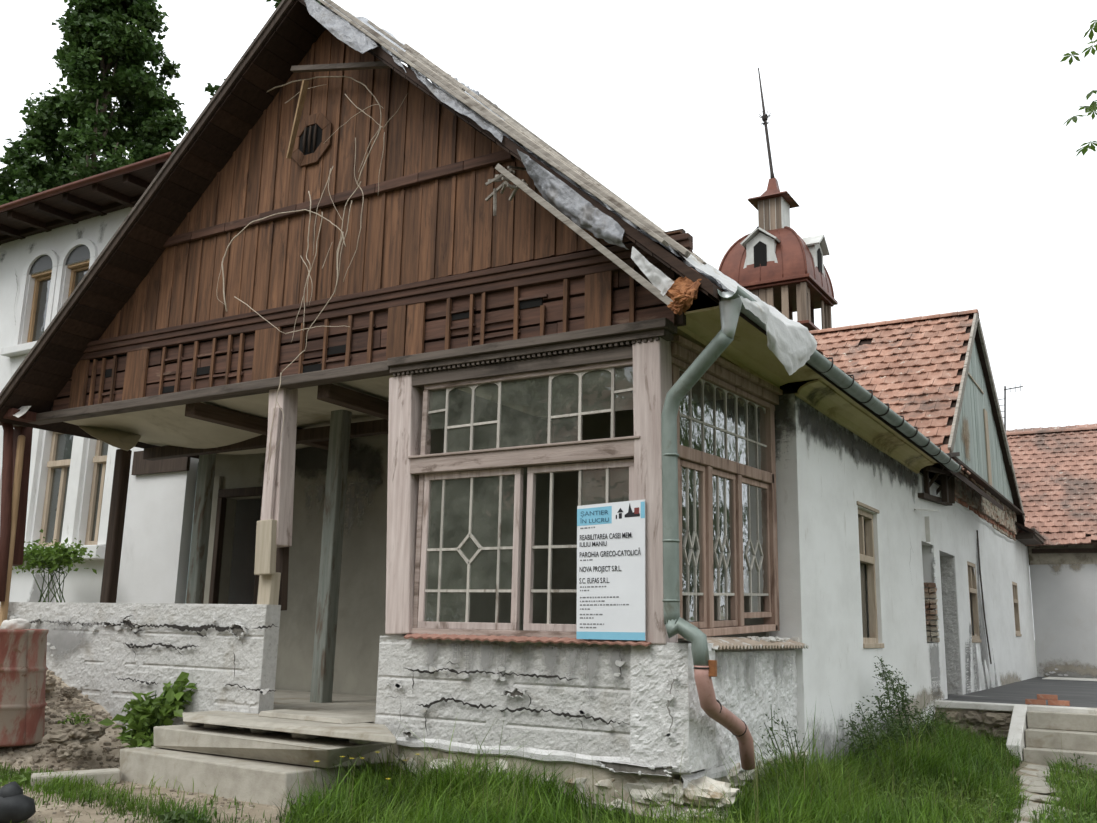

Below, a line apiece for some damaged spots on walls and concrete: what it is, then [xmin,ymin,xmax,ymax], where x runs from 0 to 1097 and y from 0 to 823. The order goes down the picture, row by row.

leakage [774,389,919,498]
spalling [229,623,247,640]
crack [10,615,277,695]
crack [614,655,626,677]
crack [384,661,629,737]
spalling [501,687,527,698]
spalling [592,759,677,777]